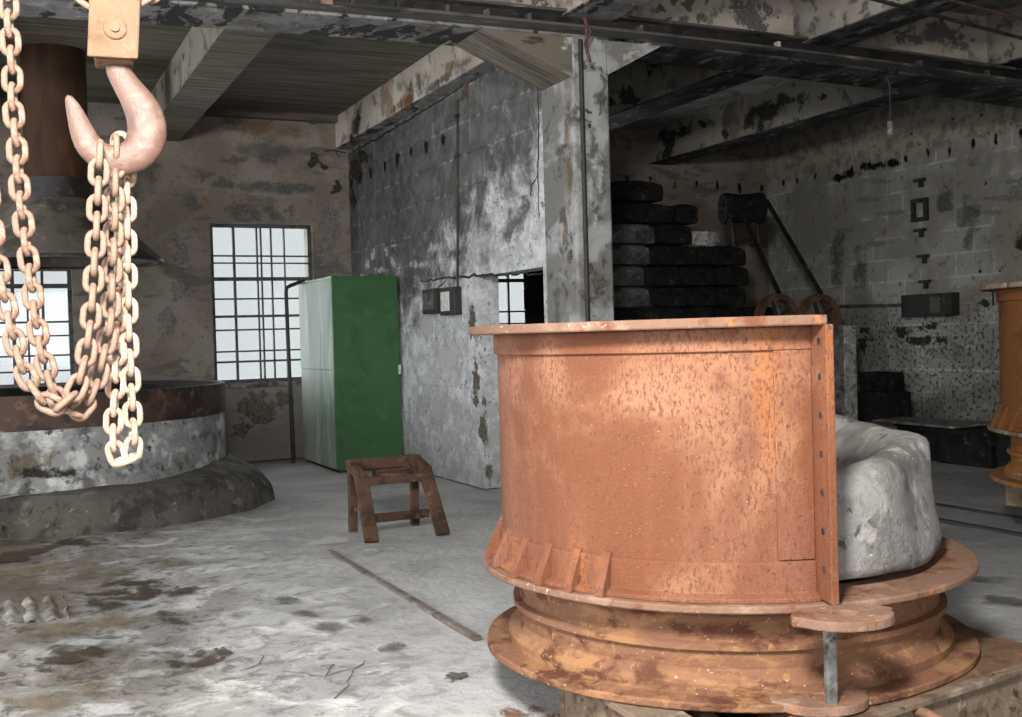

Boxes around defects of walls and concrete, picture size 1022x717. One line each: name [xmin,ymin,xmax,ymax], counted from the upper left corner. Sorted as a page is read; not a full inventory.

peeling [656,0,709,23]
peeling [729,0,774,32]
peeling [889,15,974,51]
damp [416,60,470,93]
damp [349,150,372,209]
damp [503,196,530,242]
damp [0,537,96,564]
damp [85,570,197,626]
damp [34,623,114,672]
crack [239,656,365,699]
damp [88,703,132,716]